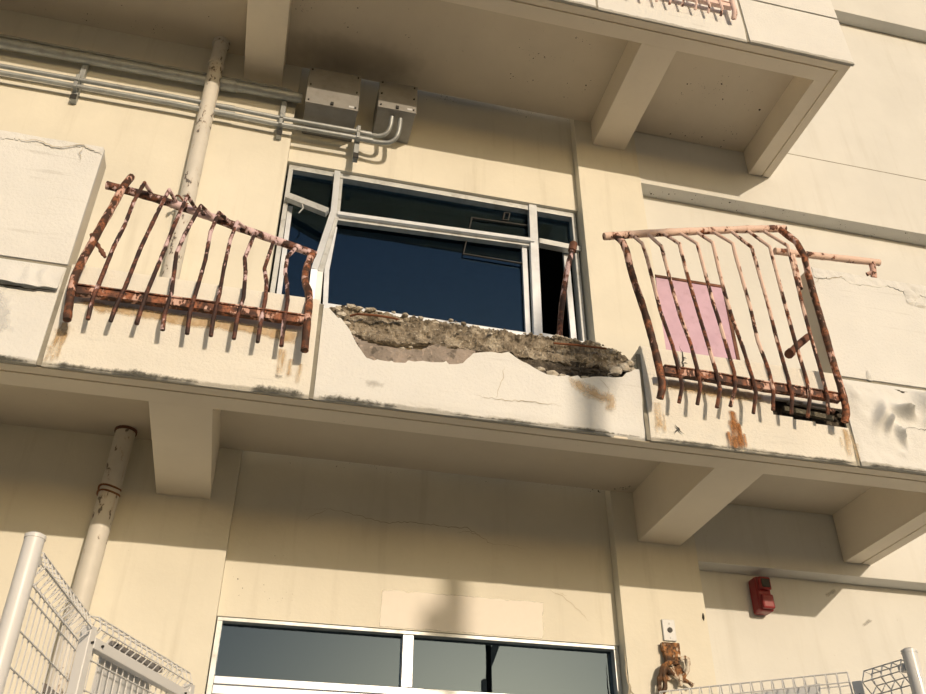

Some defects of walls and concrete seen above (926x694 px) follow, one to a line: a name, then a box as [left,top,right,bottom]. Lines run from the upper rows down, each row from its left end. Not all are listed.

peeling [0,130,104,155]
peeling [0,258,65,291]
corrosion [85,302,301,374]
spalling [329,304,636,378]
corrosion [668,380,761,399]
corrosion [727,411,747,448]